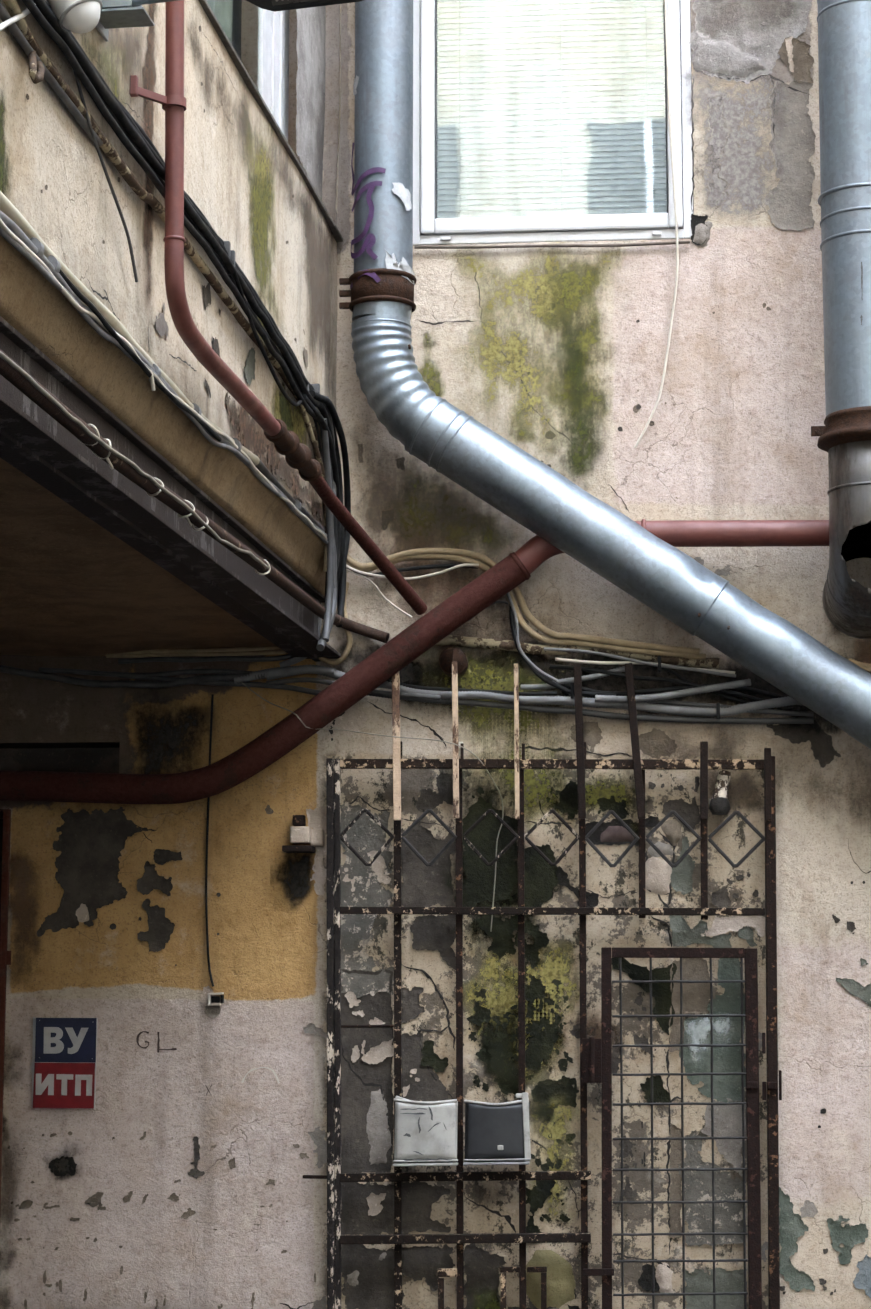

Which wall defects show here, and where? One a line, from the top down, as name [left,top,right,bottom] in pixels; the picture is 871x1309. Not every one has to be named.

damp [191,35,224,98]
damp [239,101,252,150]
flaking render [689,0,816,245]
damp [252,152,333,386]
damp [510,409,534,439]
damp [546,264,606,478]
peeling [37,807,182,952]
spalling [586,776,700,895]
peeling [836,958,871,1007]
peeling [612,915,762,1246]
damp [0,1123,16,1224]
peeling [761,1187,871,1298]